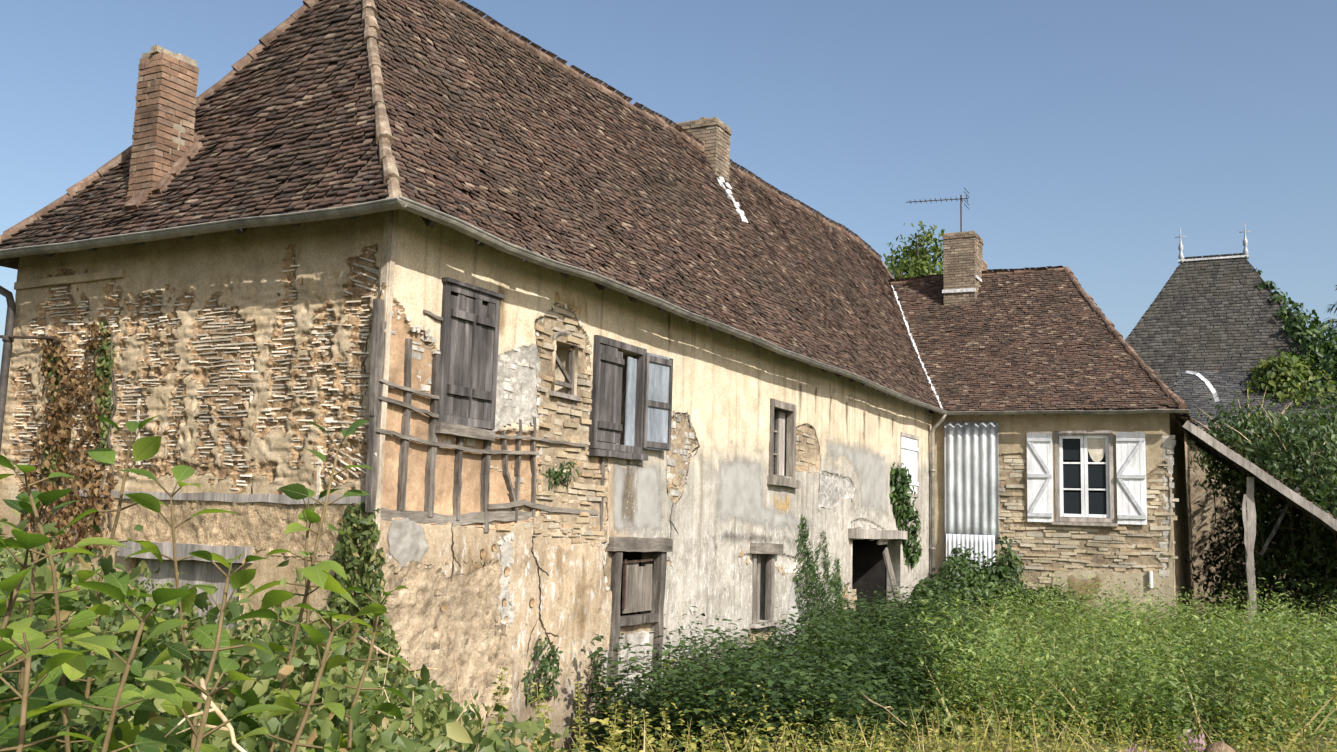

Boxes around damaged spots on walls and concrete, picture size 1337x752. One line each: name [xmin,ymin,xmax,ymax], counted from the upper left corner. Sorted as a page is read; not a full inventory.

flaking render [8,243,611,721]
flaking render [666,410,699,503]
crack [526,532,562,676]